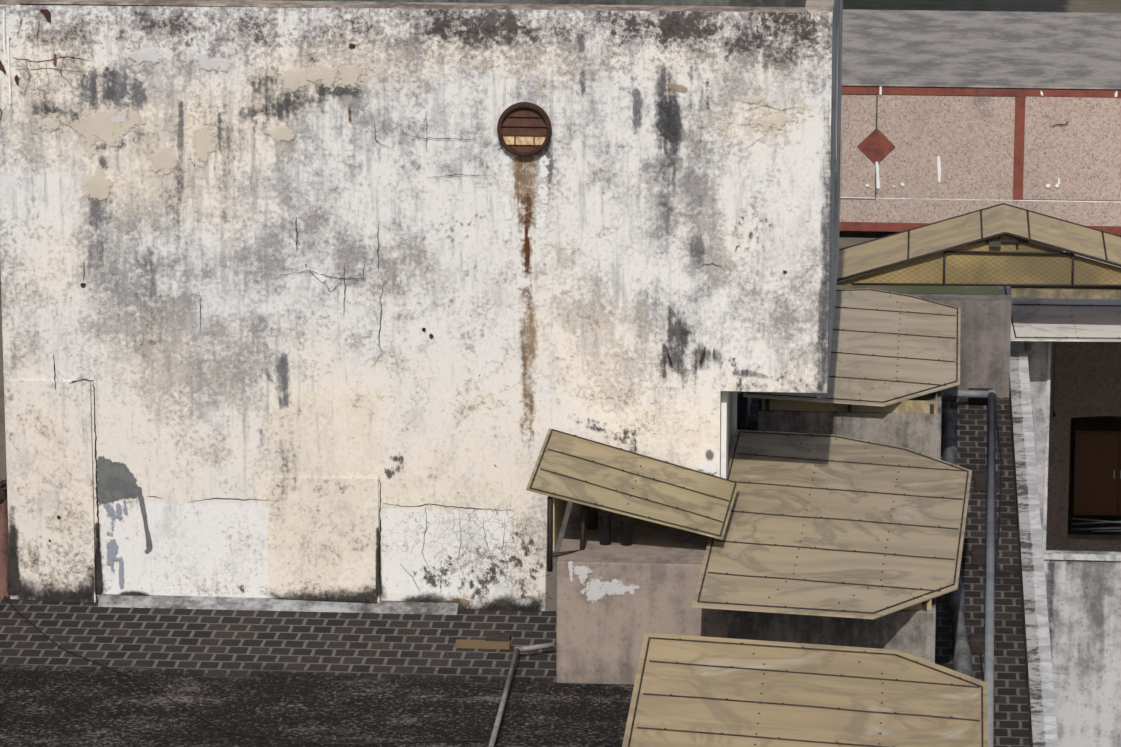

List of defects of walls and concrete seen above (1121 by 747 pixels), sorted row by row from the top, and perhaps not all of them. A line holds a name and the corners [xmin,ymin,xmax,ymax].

damp [419,7,530,47]
damp [701,10,818,61]
damp [33,103,78,121]
damp [81,68,146,107]
damp [633,89,641,128]
damp [655,68,692,180]
rust [514,156,535,273]
damp [661,139,842,400]
rust [521,296,536,420]
crack [379,480,508,599]
damp [402,532,543,612]
damp [1047,560,1079,638]